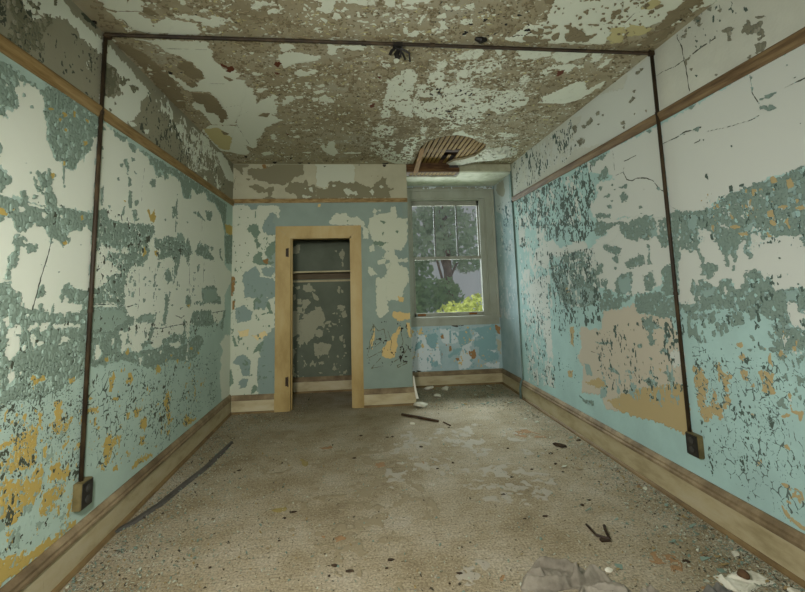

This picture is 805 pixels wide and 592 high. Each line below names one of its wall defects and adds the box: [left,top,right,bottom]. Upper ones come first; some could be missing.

crack [658,16,766,91]
flaking render [0,0,805,414]
spalling [5,493,15,526]
peeling [63,328,805,592]